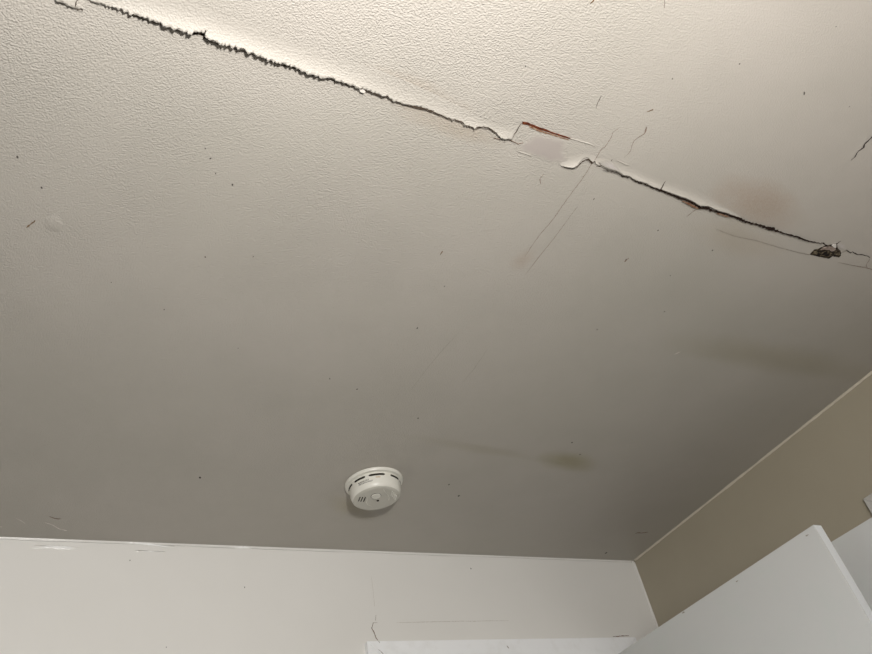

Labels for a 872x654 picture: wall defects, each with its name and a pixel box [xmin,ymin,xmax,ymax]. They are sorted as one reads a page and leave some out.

peeling [56,0,520,140]
crack [527,127,821,271]